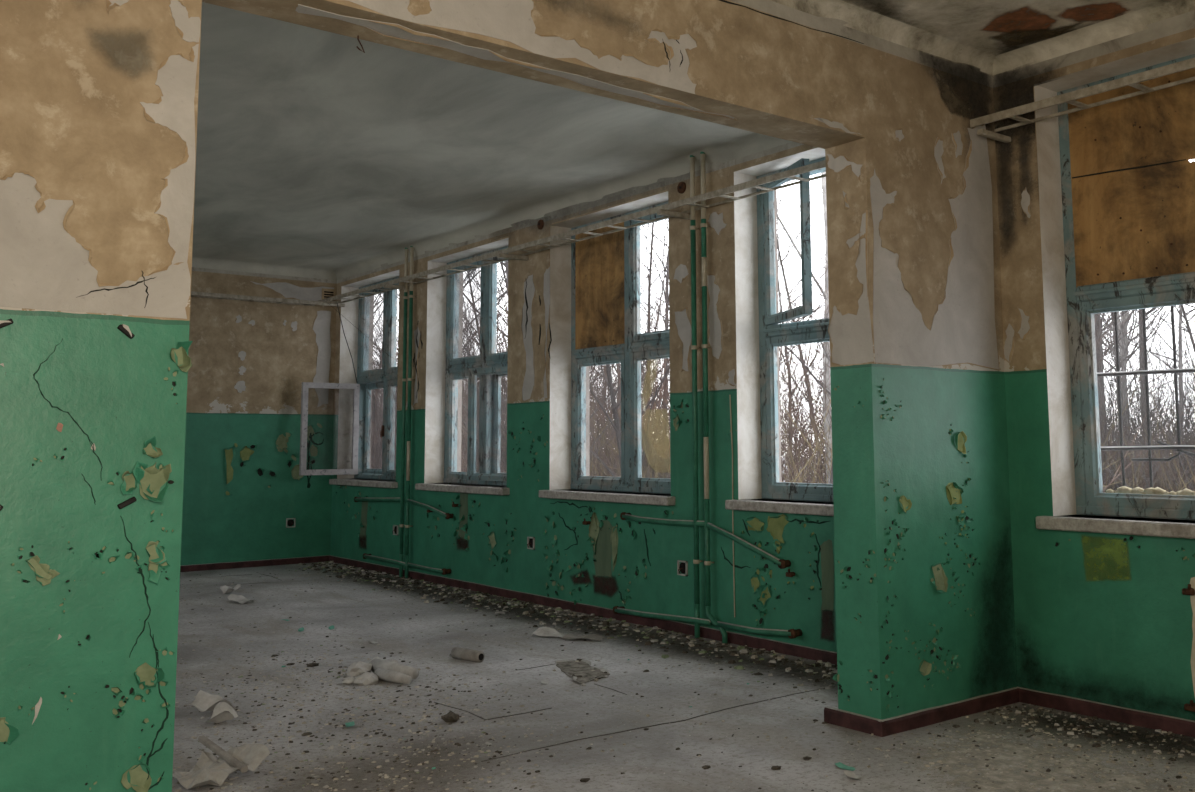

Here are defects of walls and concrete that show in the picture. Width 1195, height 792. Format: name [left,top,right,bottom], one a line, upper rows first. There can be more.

peeling [295,0,738,121]
leakage [856,0,897,19]
peeling [0,0,201,319]
peeling [827,69,1031,371]
peeling [251,281,334,407]
peeling [675,307,692,372]
peeling [707,274,723,359]
crack [33,339,169,790]
peeling [93,436,175,584]
peeling [741,514,822,627]
peeling [930,478,980,616]
peeling [104,647,175,719]